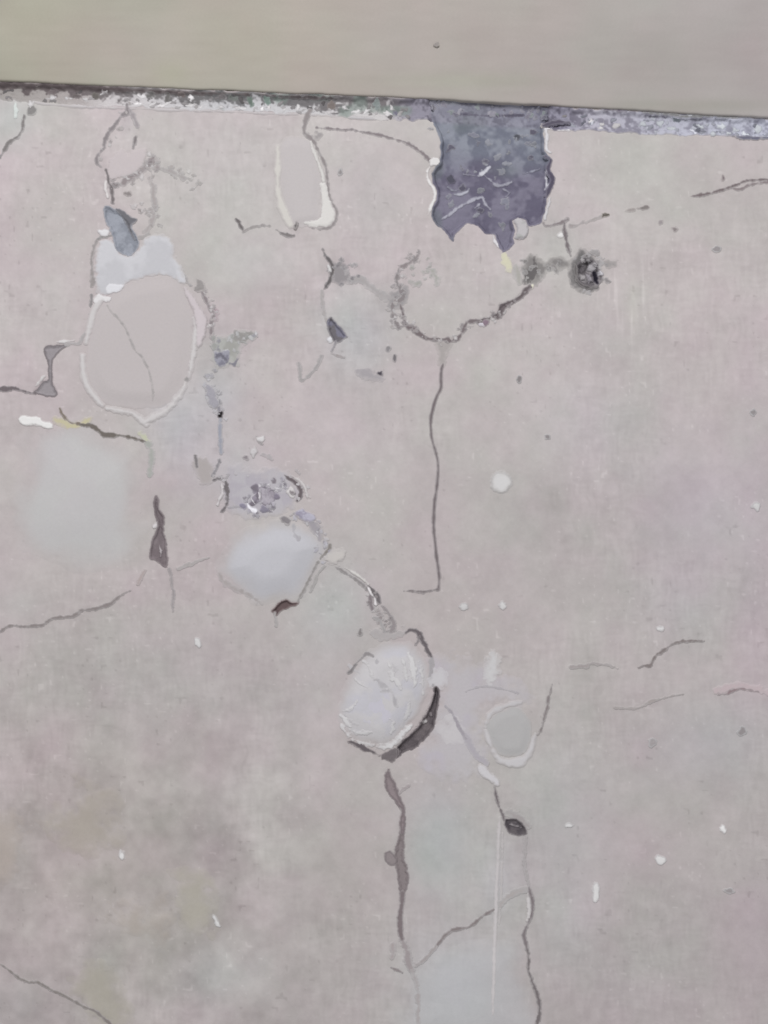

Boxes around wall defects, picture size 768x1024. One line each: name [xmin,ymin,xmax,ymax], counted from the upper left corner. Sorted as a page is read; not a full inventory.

crack [94,101,203,234]
spalling [0,81,768,253]
crack [690,174,768,198]
peeling [93,205,186,304]
crack [0,240,210,633]
peeling [191,368,332,565]
crack [234,107,542,1024]
crack [536,638,705,736]
crack [712,681,768,697]
crack [0,963,112,1024]